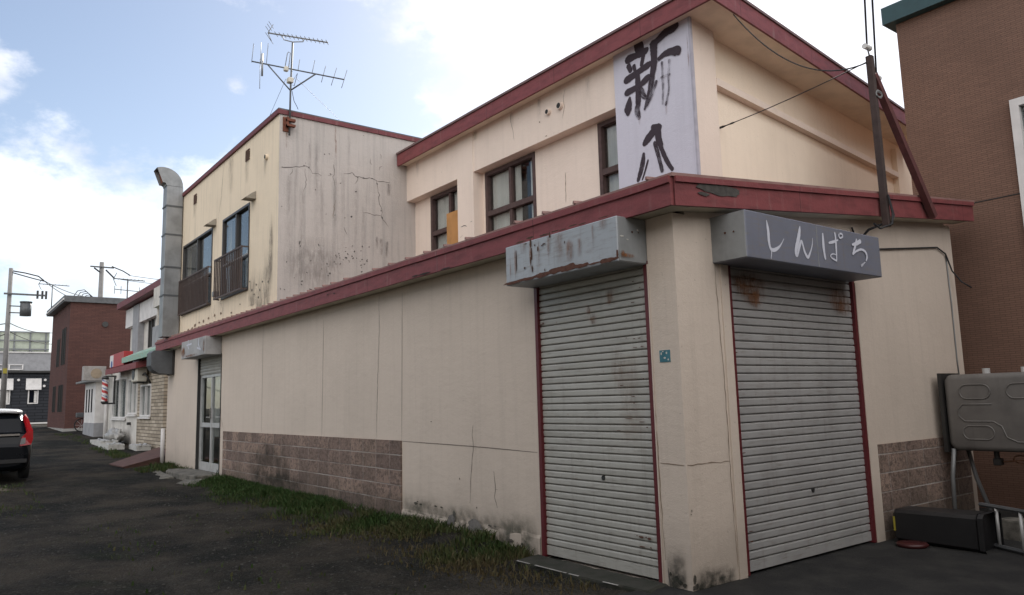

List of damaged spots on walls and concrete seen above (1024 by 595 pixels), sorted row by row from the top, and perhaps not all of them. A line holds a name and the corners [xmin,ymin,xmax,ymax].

crack [282,154,390,234]
peeling [696,183,739,197]
peeling [516,222,586,272]
damp [670,565,685,588]